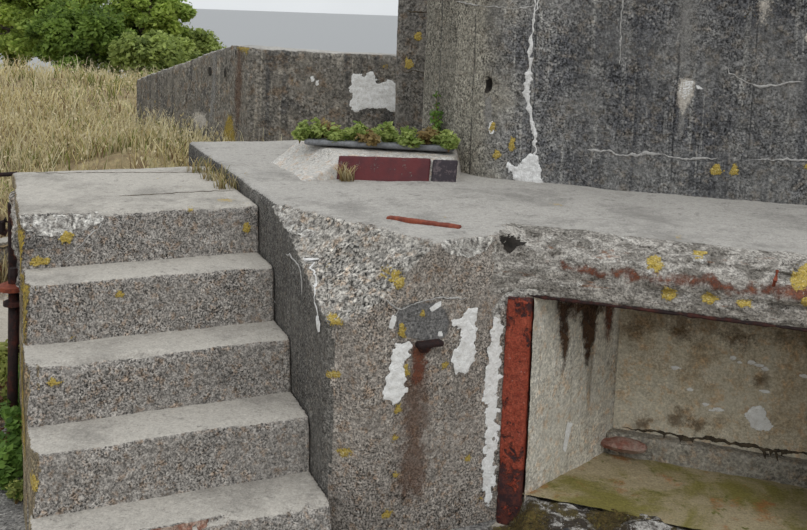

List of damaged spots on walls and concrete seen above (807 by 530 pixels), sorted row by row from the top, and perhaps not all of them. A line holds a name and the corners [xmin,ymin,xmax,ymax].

crack [617,0,625,64]
peeling [349,71,396,112]
crack [455,0,544,183]
crack [728,69,801,88]
crack [587,149,716,161]
crack [743,155,807,163]
corrosion [561,261,807,300]
peeling [382,339,413,405]
corrosion [412,344,430,384]
peeling [451,308,478,375]
peeling [481,288,547,506]
corrosion [557,301,614,366]